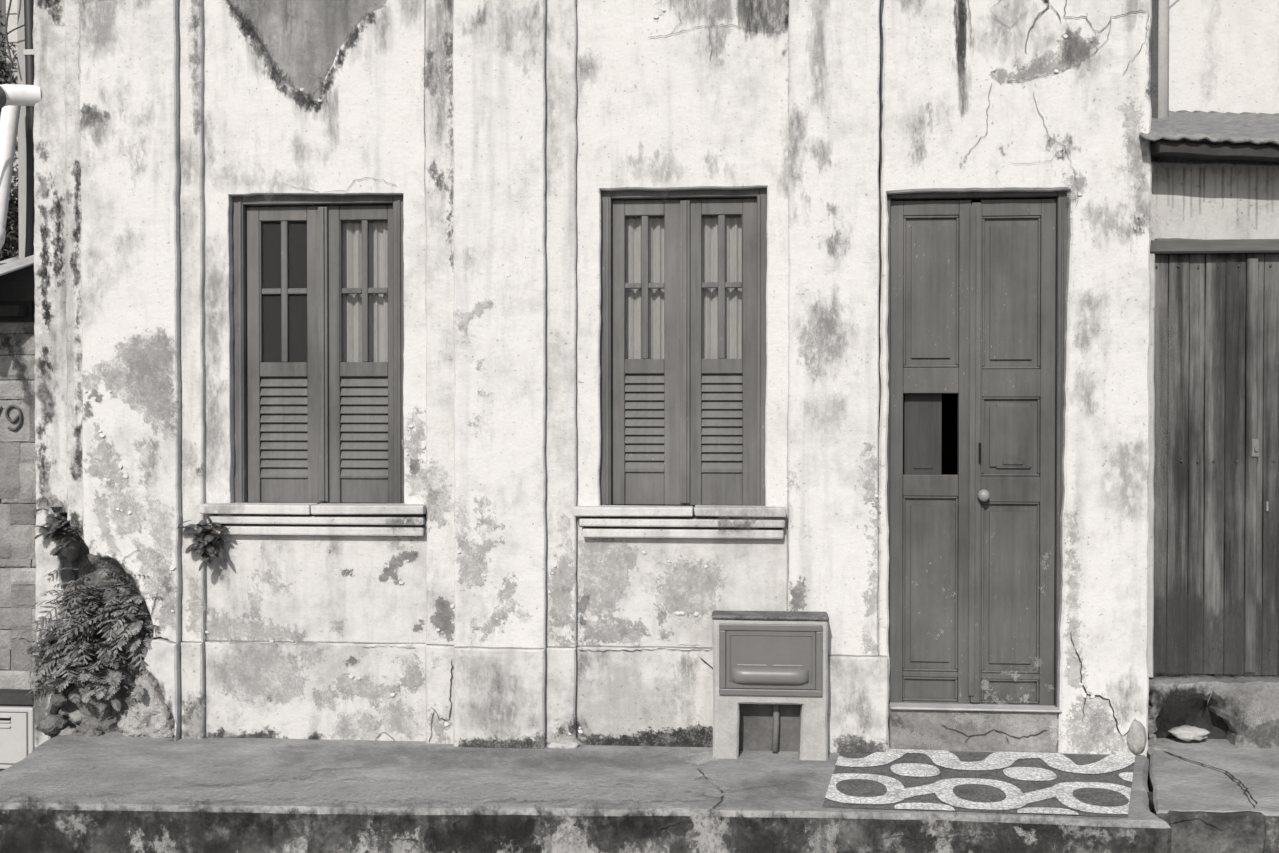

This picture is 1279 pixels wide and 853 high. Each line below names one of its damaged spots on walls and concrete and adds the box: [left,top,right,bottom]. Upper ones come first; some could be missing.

leakage [738,0,789,31]
leakage [954,0,967,113]
crack [963,0,1149,205]
leakage [37,160,81,329]
leakage [0,334,86,573]
spalling [28,329,205,739]
peeling [379,408,444,584]
peeling [413,596,455,641]
peeling [472,575,528,640]
peeling [546,516,724,648]
crack [1071,636,1136,737]
leakage [424,807,552,853]